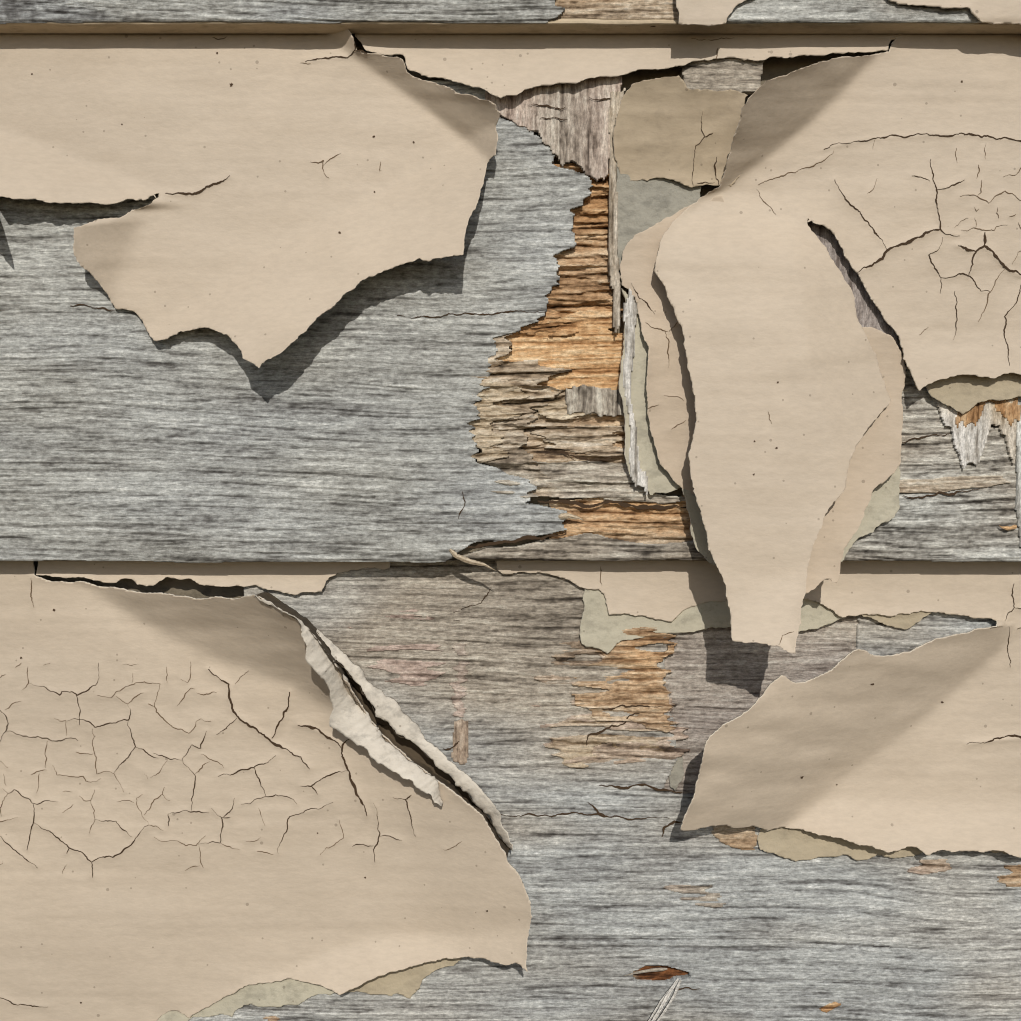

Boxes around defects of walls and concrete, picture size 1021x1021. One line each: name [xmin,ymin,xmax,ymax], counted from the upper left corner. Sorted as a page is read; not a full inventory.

peeling [676,0,1021,27]
peeling [0,29,899,595]
crack [758,133,1021,365]
peeling [188,34,1021,1021]
crack [0,662,414,878]
peeling [0,561,532,1021]
crack [969,734,1021,743]